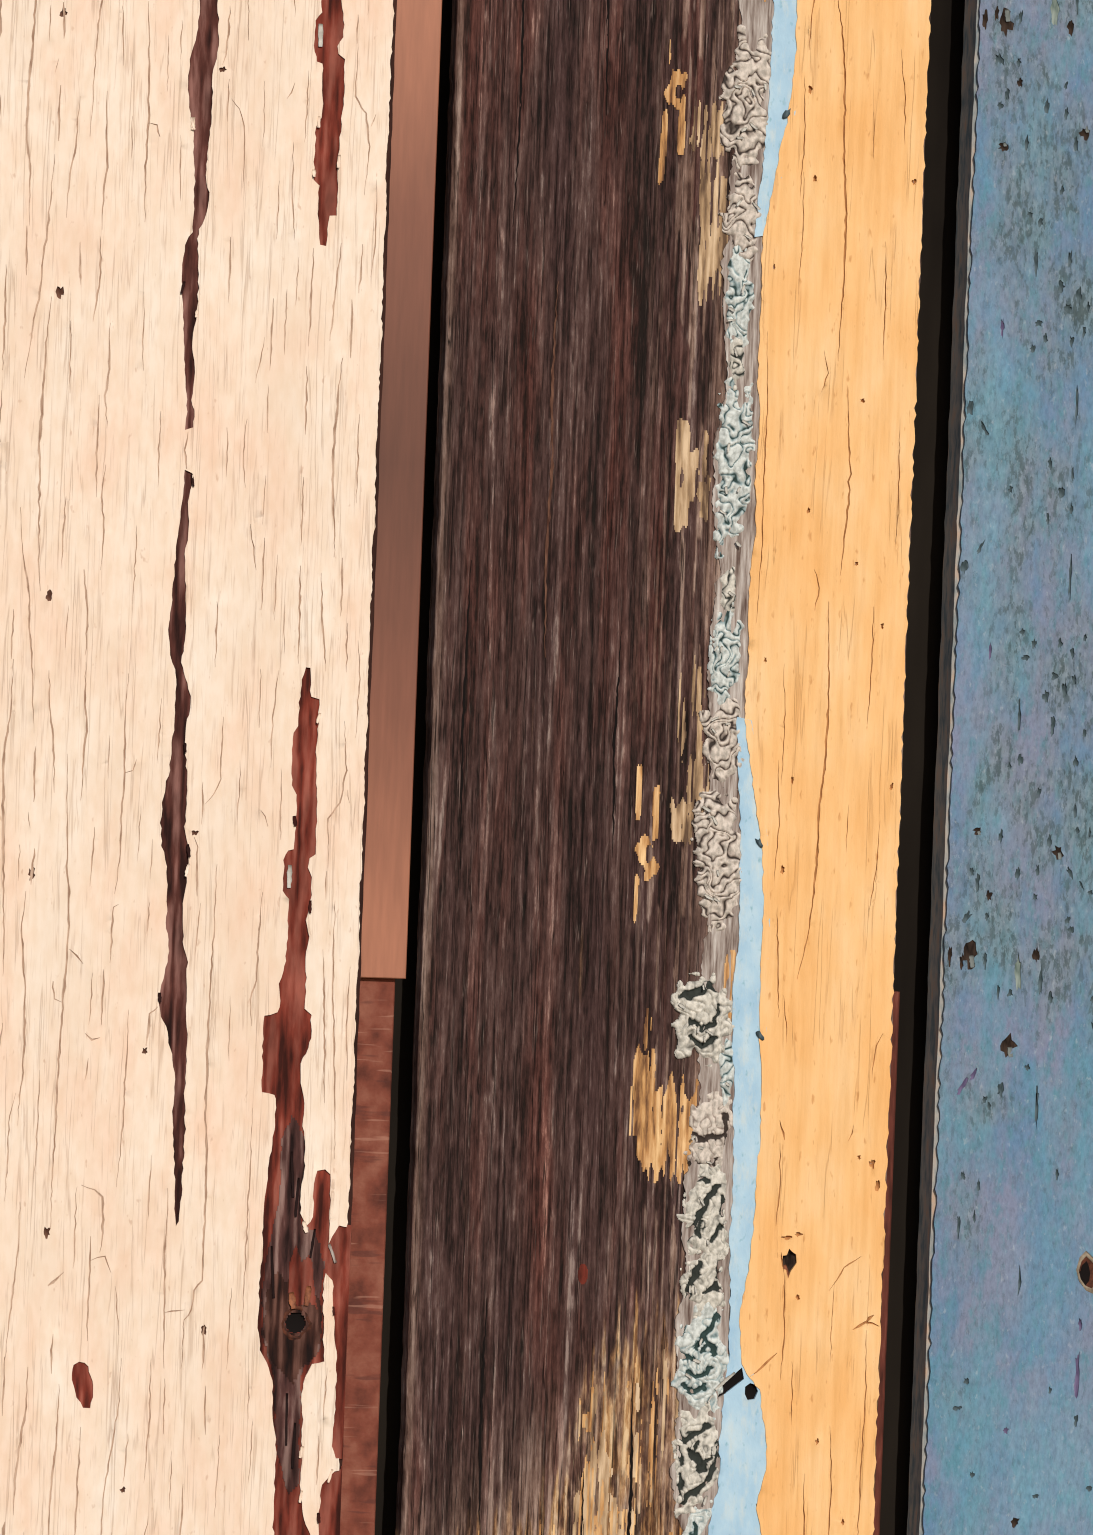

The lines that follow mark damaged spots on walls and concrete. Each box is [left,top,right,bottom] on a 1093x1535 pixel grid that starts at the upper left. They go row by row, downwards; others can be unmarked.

peeling [180,0,226,430]
peeling [312,0,345,246]
water stain [689,100,724,159]
peeling [158,470,199,1225]
crack [0,0,377,1535]
water stain [670,797,704,847]
peeling [257,667,351,1535]
peeling [72,1362,93,1408]
water stain [564,1380,652,1535]
water stain [661,1349,679,1460]